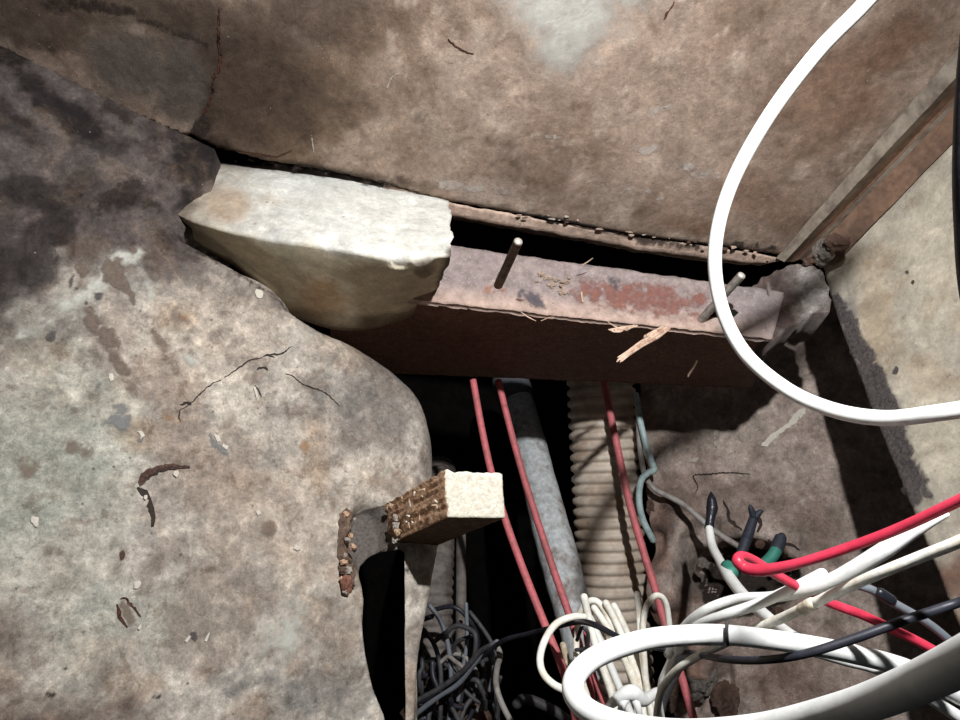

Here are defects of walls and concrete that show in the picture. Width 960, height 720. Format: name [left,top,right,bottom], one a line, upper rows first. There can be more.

crack [191,8,292,158]
peeling [517,212,705,249]
water stain [54,248,144,389]
corrosion [577,281,706,316]
crack [178,347,338,422]